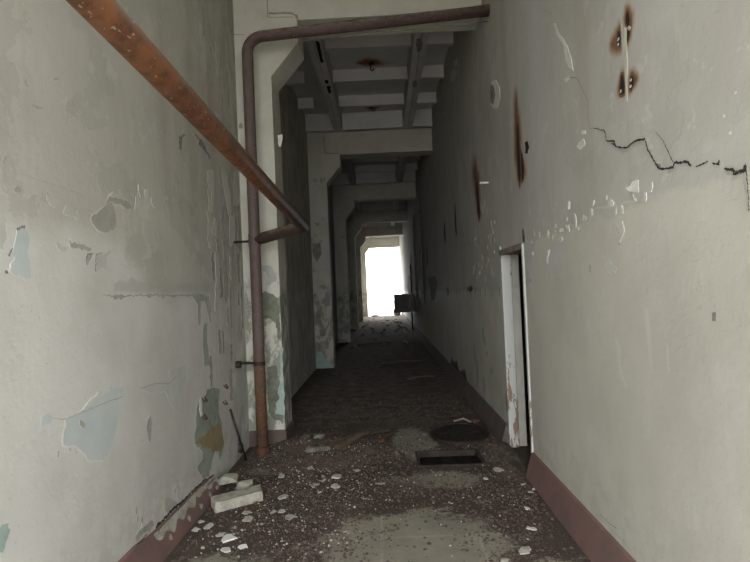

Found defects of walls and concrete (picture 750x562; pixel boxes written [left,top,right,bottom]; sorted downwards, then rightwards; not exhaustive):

corrosion [346,55,402,69]
crack [543,11,588,101]
corrosion [606,0,642,109]
peeling [90,185,154,233]
corrosion [470,144,484,230]
corrosion [510,71,531,199]
peeling [525,180,653,245]
crack [588,119,747,178]
peeling [135,162,244,542]
peeling [262,291,285,422]
peeling [316,352,332,369]
peeling [41,386,125,463]